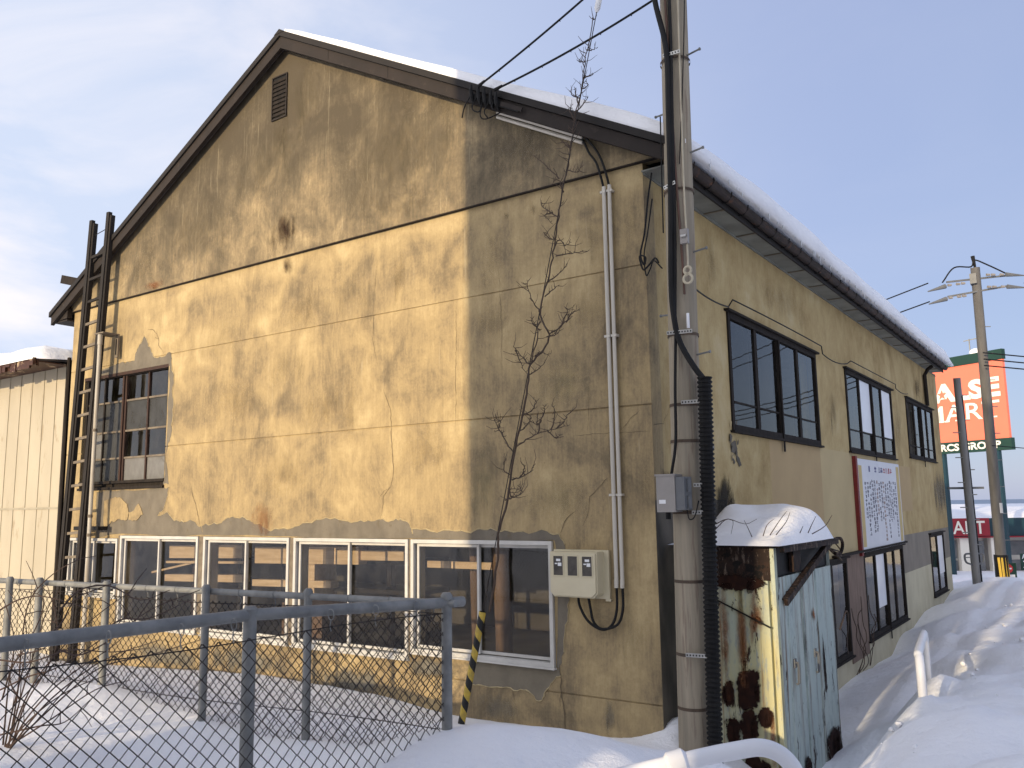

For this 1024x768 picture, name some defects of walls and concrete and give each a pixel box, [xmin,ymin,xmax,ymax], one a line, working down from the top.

spalling [96,336,565,549]
spalling [468,597,570,702]